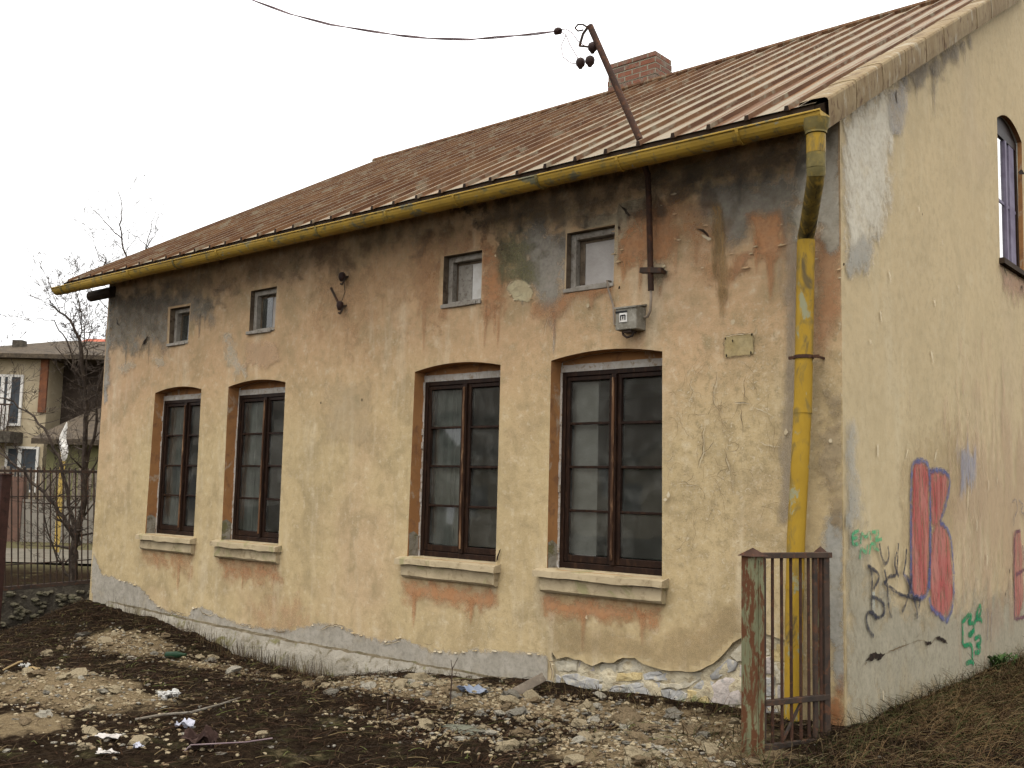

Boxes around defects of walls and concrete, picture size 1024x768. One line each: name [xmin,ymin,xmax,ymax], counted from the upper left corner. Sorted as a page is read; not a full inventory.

damp [889,39,971,133]
peeling [507,280,533,302]
damp [464,135,804,518]
peeling [729,131,807,290]
flaking render [815,92,895,345]
crack [664,333,788,550]
spalling [551,639,741,708]
spalling [766,634,785,714]